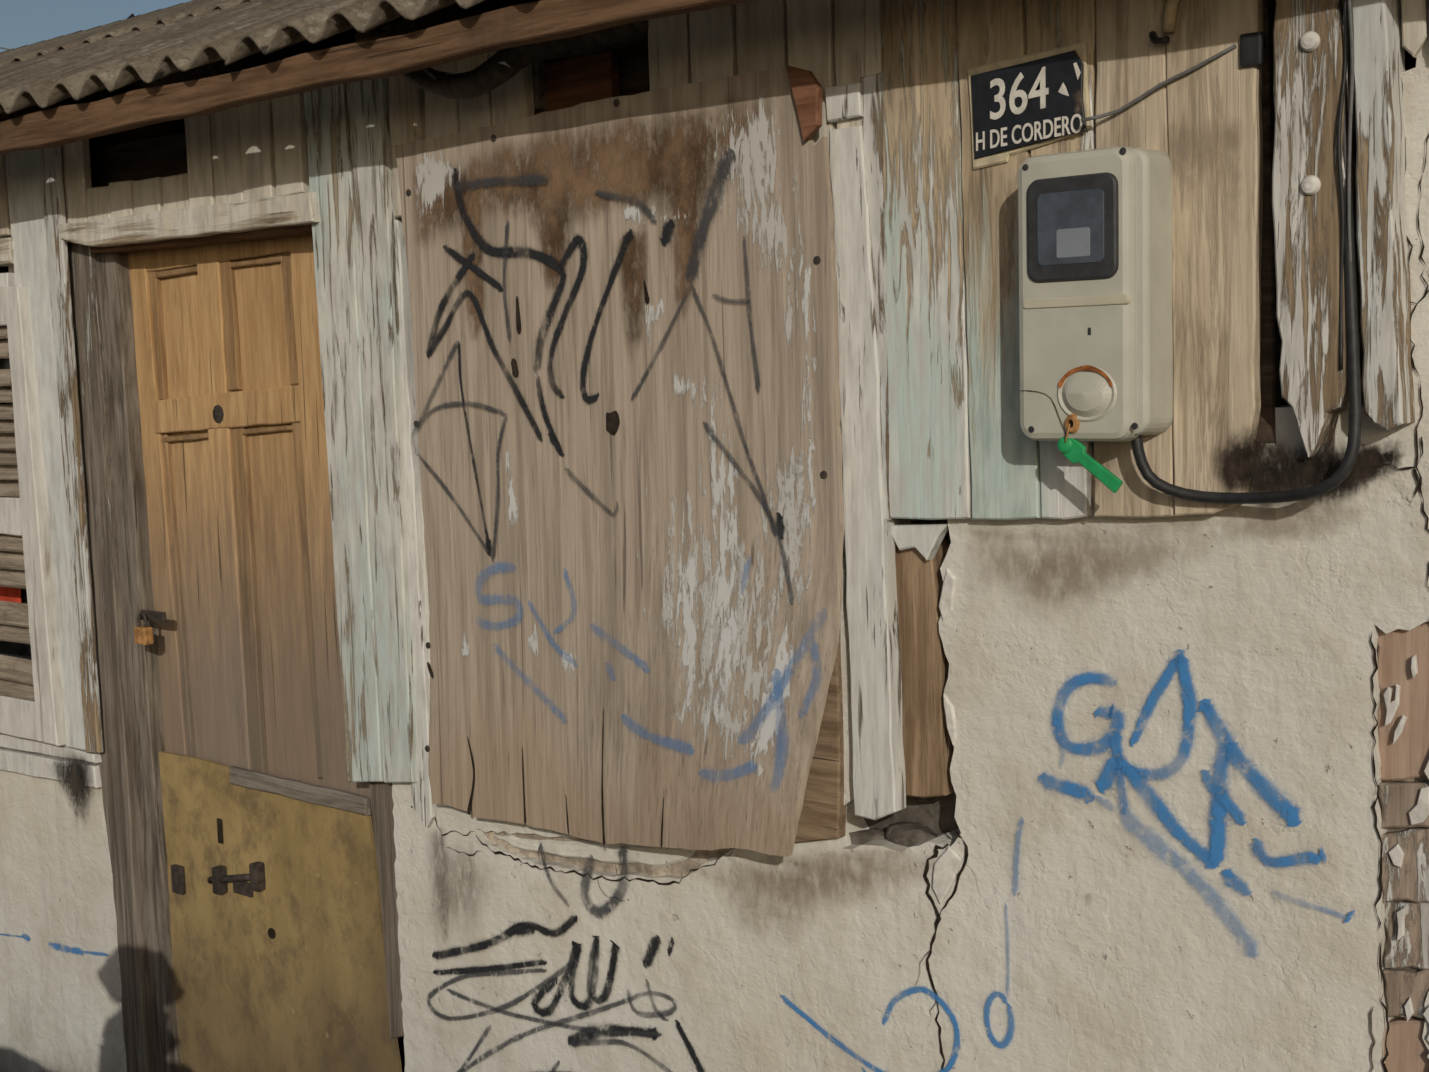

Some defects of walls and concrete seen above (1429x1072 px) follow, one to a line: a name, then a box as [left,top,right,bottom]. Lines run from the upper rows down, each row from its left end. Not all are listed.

peeling [416,91,816,786]
damp [1221,428,1401,497]
crack [1366,135,1429,588]
flaking render [482,831,735,877]
crack [915,825,979,1070]
flaking render [1377,621,1429,1072]